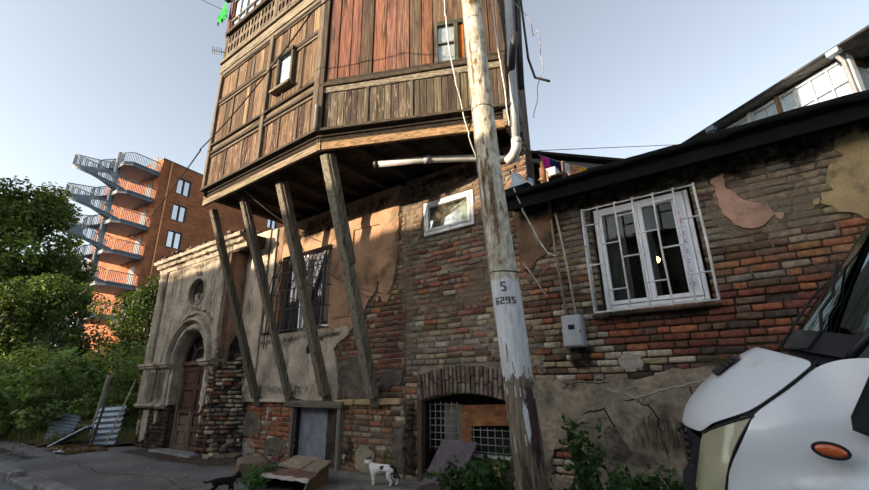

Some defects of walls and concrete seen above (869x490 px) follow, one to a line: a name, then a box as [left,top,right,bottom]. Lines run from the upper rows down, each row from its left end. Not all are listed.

flaking render [710,173,784,229]
flaking render [812,128,869,219]
crack [558,373,713,435]